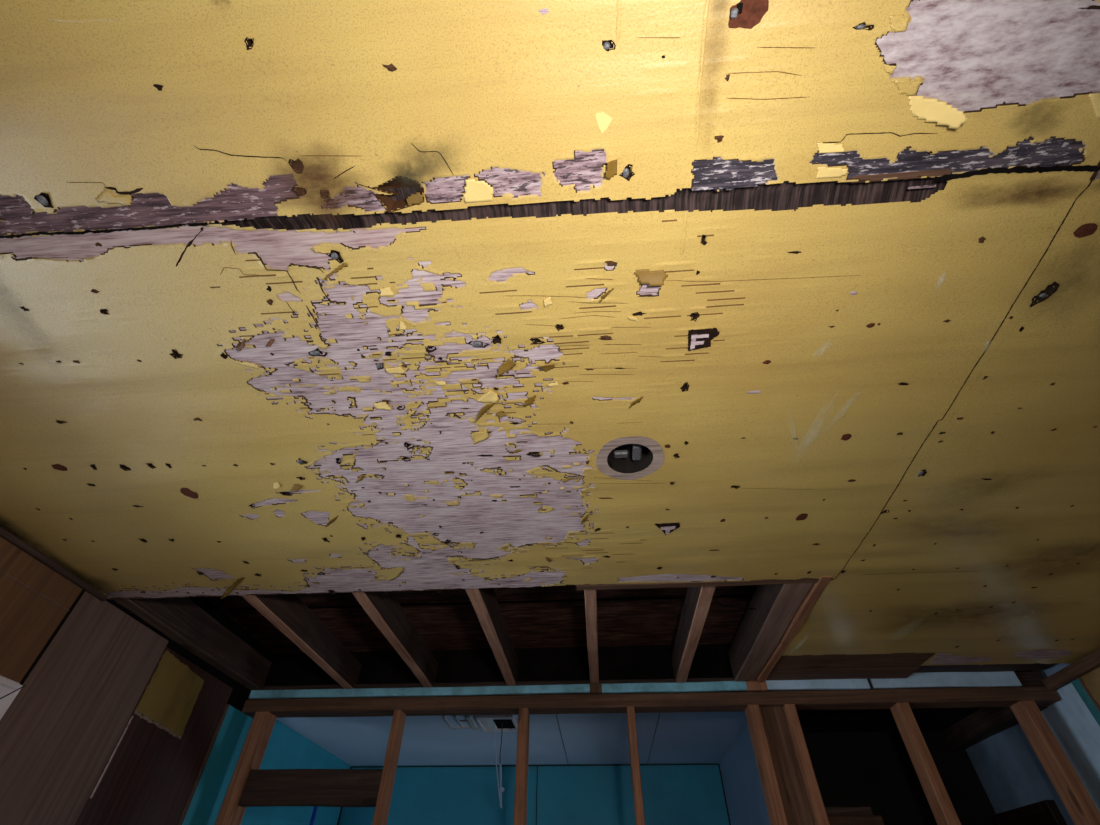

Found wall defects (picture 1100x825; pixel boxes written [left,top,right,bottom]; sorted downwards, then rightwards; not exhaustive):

rust [728,0,769,29]
crack [728,47,811,100]
peeling [876,0,1100,129]
peeling [327,149,617,213]
spalling [596,111,612,133]
peeling [692,157,778,191]
crack [817,132,936,143]
peeling [809,137,1085,179]
spalling [587,288,614,301]
peeling [634,269,668,295]
crack [0,145,1100,579]
peeling [0,174,599,599]